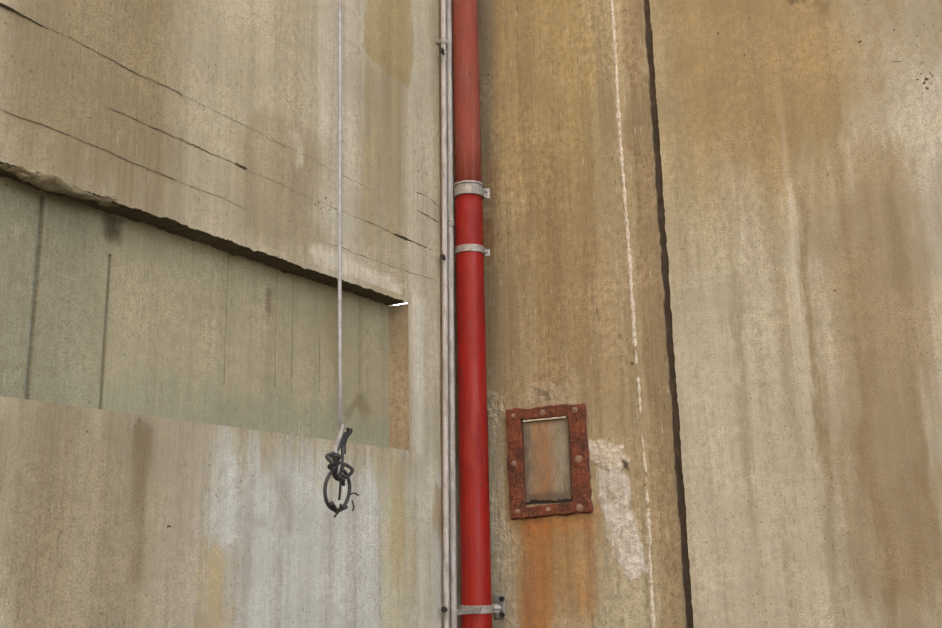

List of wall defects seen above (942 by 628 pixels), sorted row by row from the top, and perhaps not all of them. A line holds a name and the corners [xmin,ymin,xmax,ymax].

crack [1,109,245,209]
crack [0,5,376,192]
damp [227,0,430,628]
crack [318,239,436,281]
damp [610,0,638,365]
corrosion [505,492,610,628]
damp [642,434,656,628]